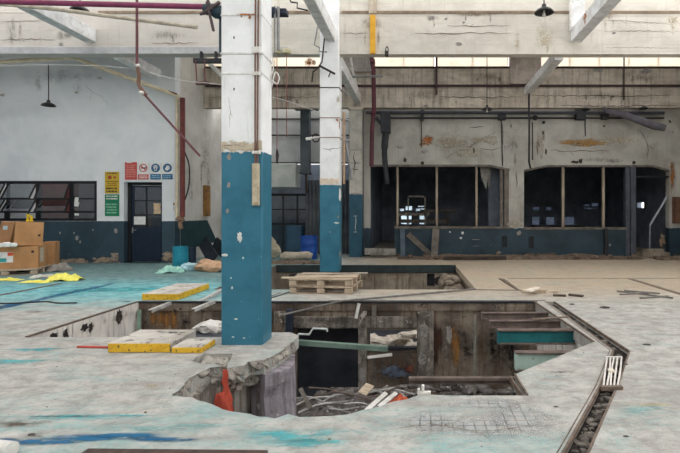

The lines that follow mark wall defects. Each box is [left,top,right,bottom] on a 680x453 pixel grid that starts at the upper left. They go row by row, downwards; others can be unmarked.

crack [415,25,509,35]
crack [603,20,676,48]
peeling [221,140,262,160]
crack [446,125,505,159]
peeling [60,253,119,263]